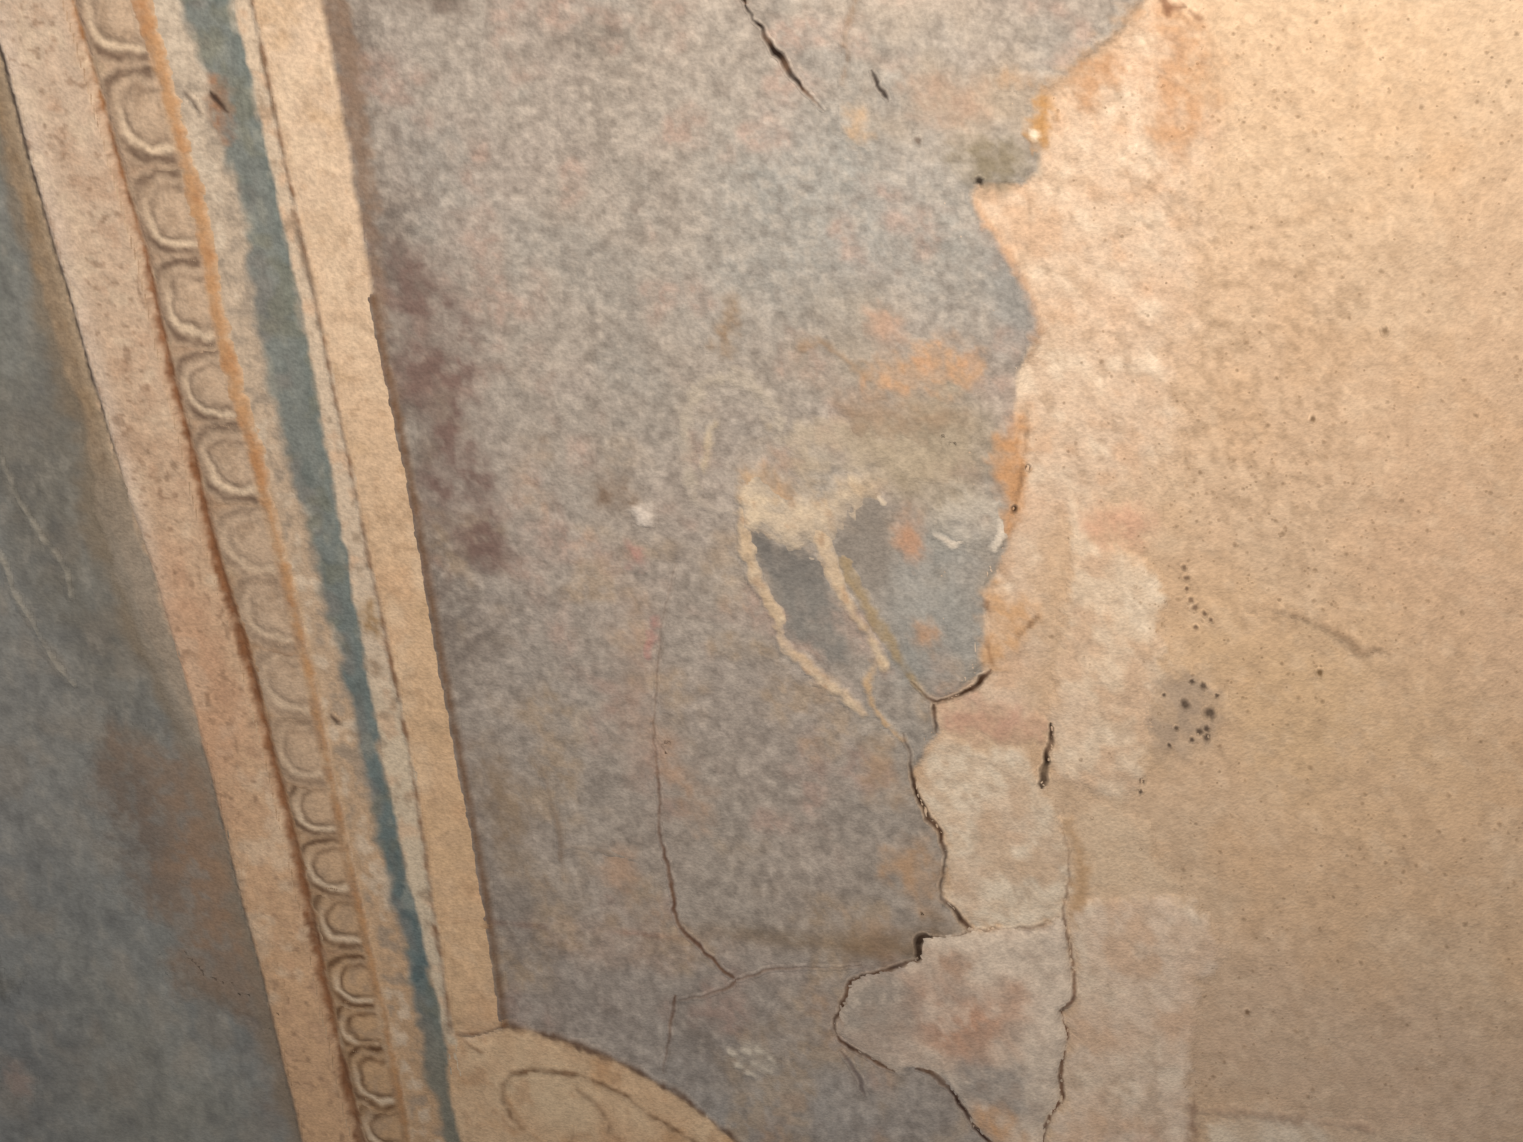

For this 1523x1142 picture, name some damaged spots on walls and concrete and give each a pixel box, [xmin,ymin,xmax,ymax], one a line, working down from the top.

crack [739,0,892,113]
flaking render [729,30,1247,930]
water stain [1134,661,1233,774]
crack [537,763,567,883]
crack [650,563,1079,1142]